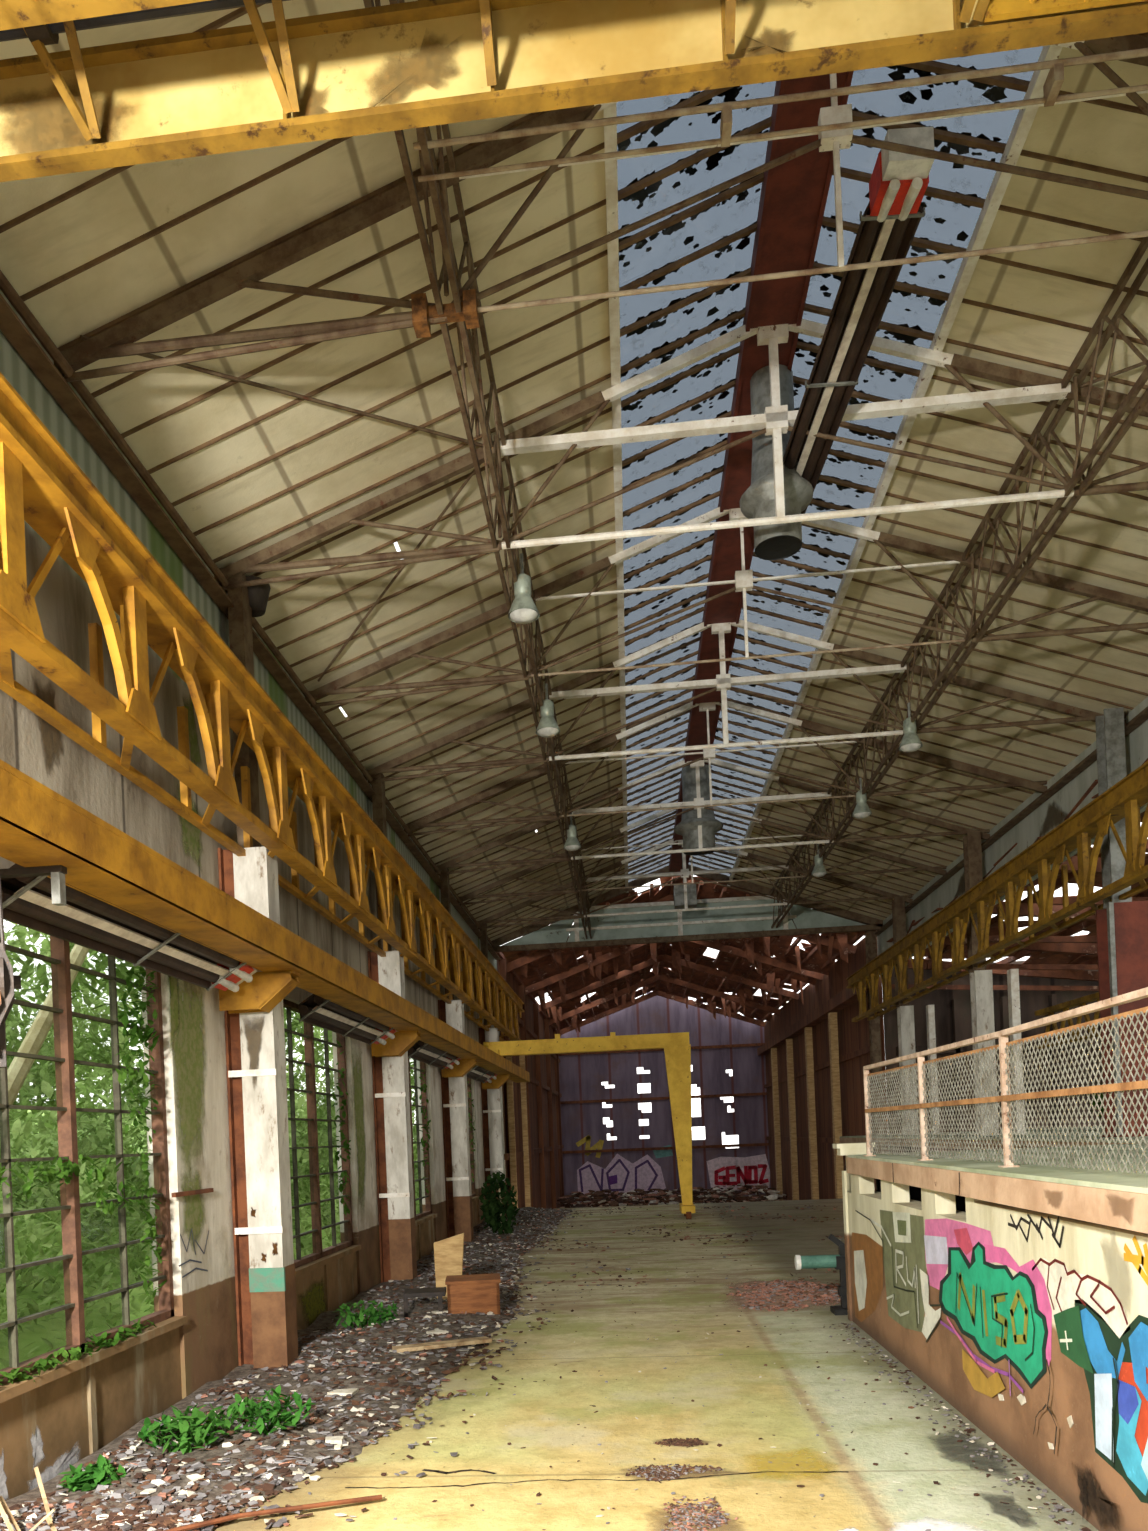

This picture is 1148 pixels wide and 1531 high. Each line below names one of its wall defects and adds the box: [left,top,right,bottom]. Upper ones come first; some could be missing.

leakage [169,976,179,1048]
leakage [181,1174,204,1247]